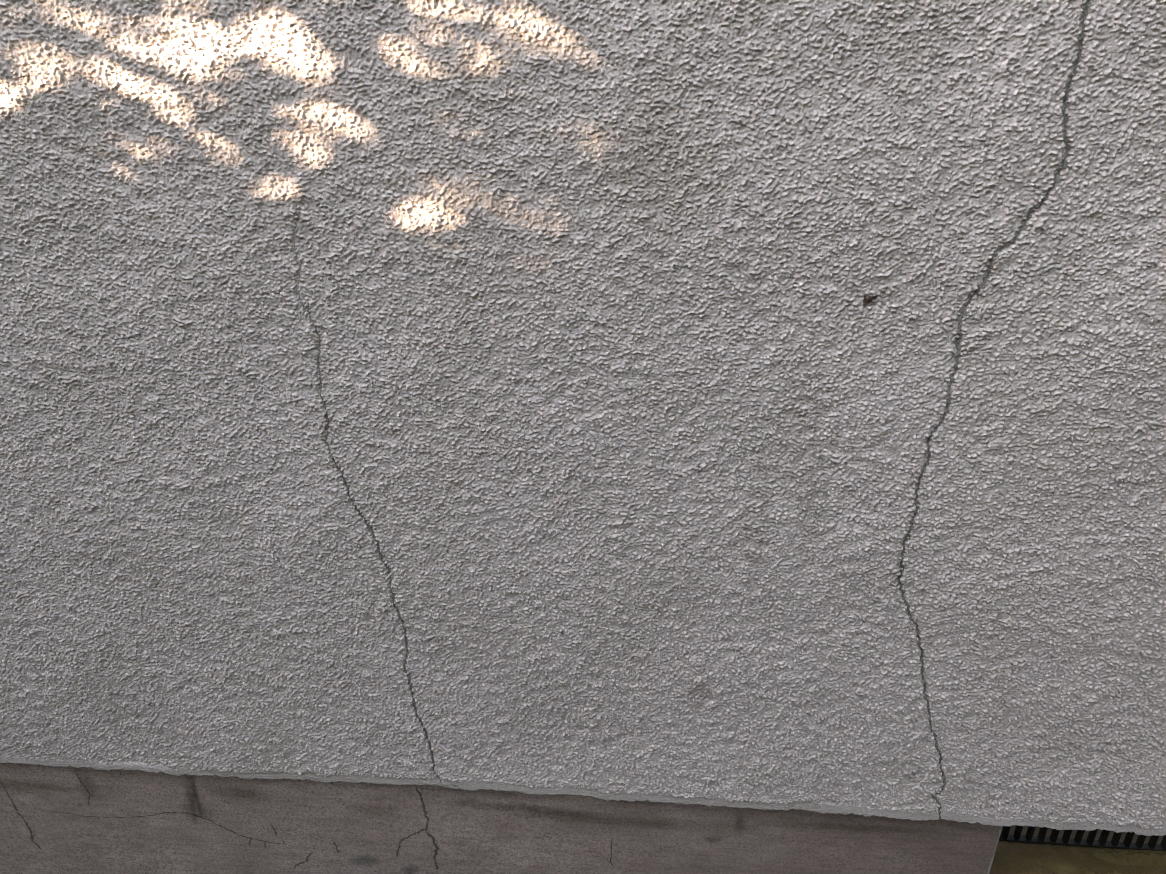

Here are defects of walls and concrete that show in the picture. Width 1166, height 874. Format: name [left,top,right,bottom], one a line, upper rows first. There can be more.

crack [0,782,41,849]
crack [259,287,442,870]
crack [898,0,1091,818]